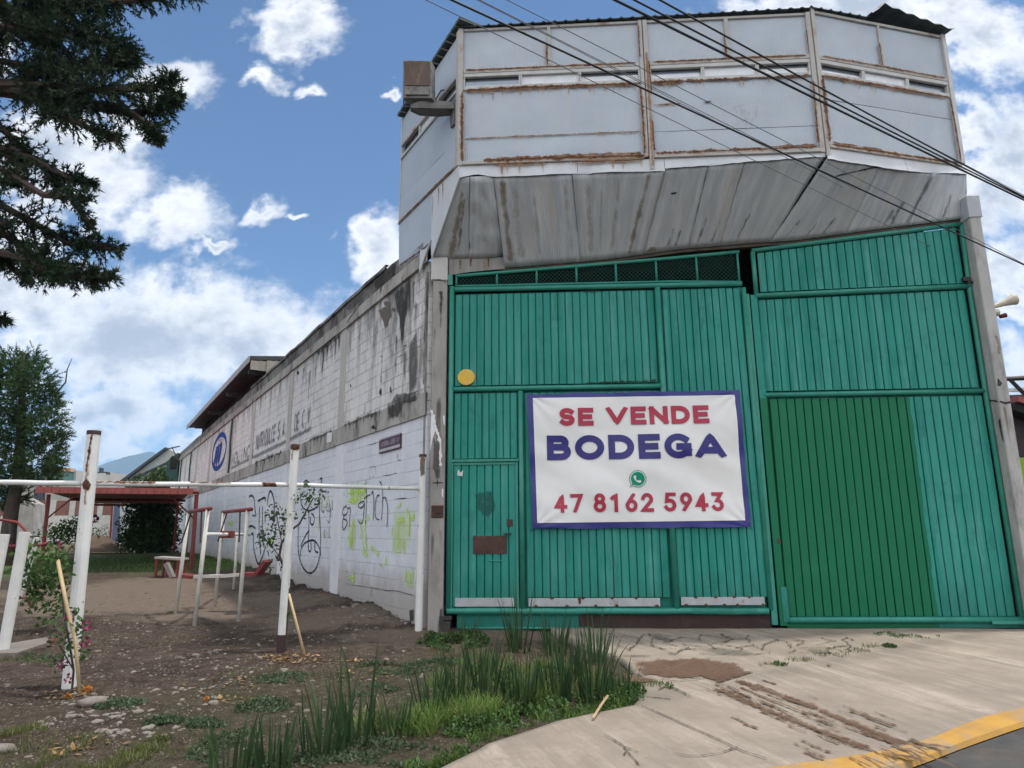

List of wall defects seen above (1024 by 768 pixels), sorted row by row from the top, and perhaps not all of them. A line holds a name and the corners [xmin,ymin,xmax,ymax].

rust [398,25,961,223]
water stain [395,283,416,373]
rust [82,430,156,504]
crack [607,633,853,758]